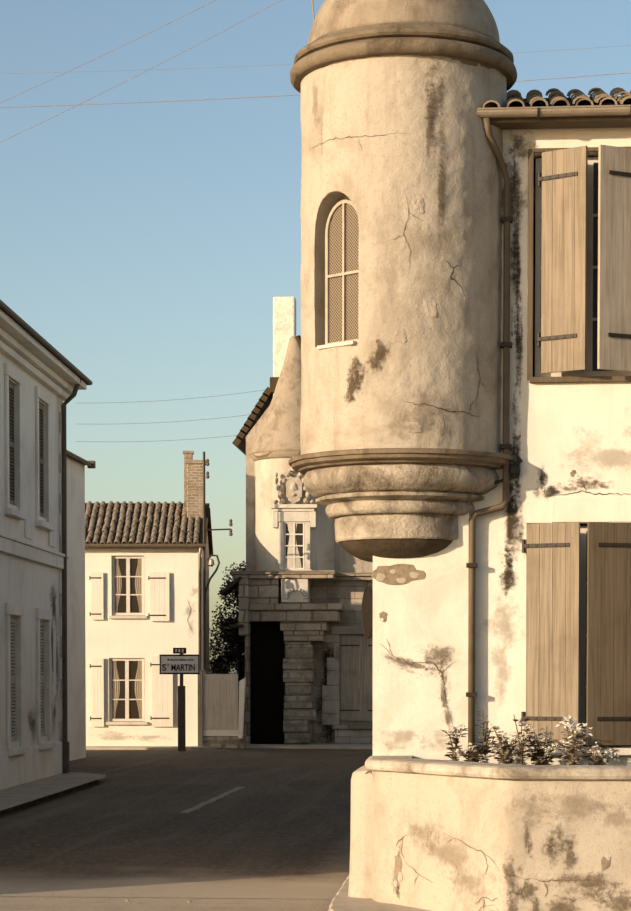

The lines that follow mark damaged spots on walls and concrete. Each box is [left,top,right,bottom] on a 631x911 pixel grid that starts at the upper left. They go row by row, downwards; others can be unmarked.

water stain [501,136,528,393]
water stain [346,340,389,402]
crack [405,352,484,434]
water stain [499,405,524,594]
spalling [371,564,426,585]
water stain [551,875,631,911]